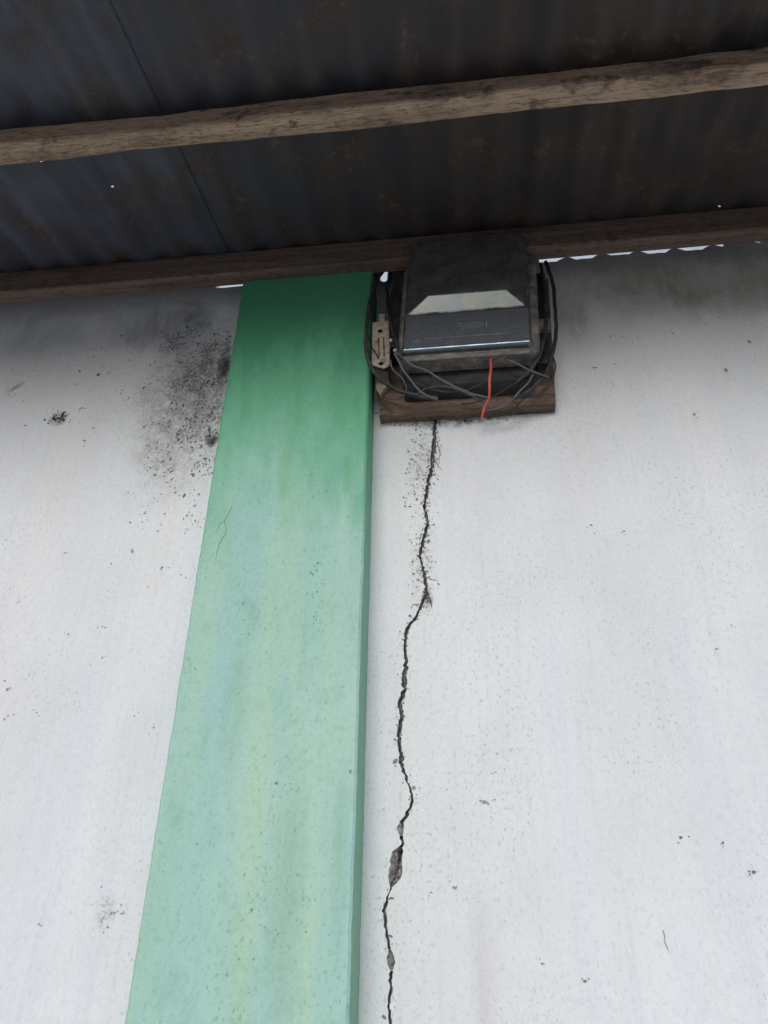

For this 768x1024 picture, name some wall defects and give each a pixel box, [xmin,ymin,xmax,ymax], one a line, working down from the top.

damp [109,317,232,534]
crack [393,419,442,848]
crack [378,888,396,1024]